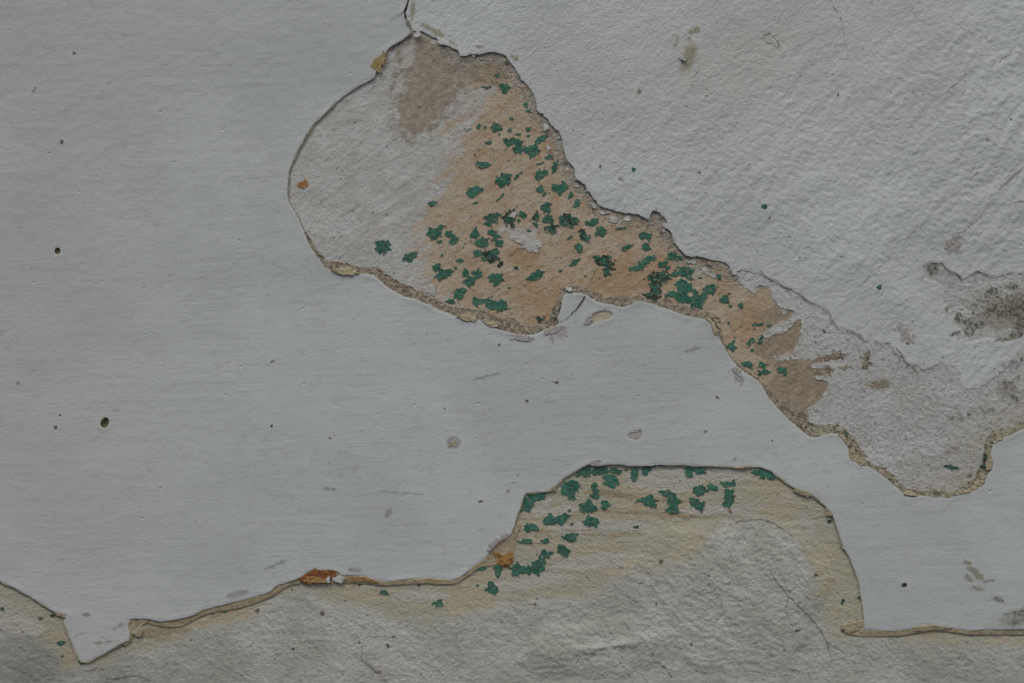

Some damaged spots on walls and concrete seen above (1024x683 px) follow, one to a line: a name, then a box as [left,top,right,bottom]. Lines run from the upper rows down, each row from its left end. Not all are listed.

peeling [287,19,1024,498]
peeling [0,458,1024,683]